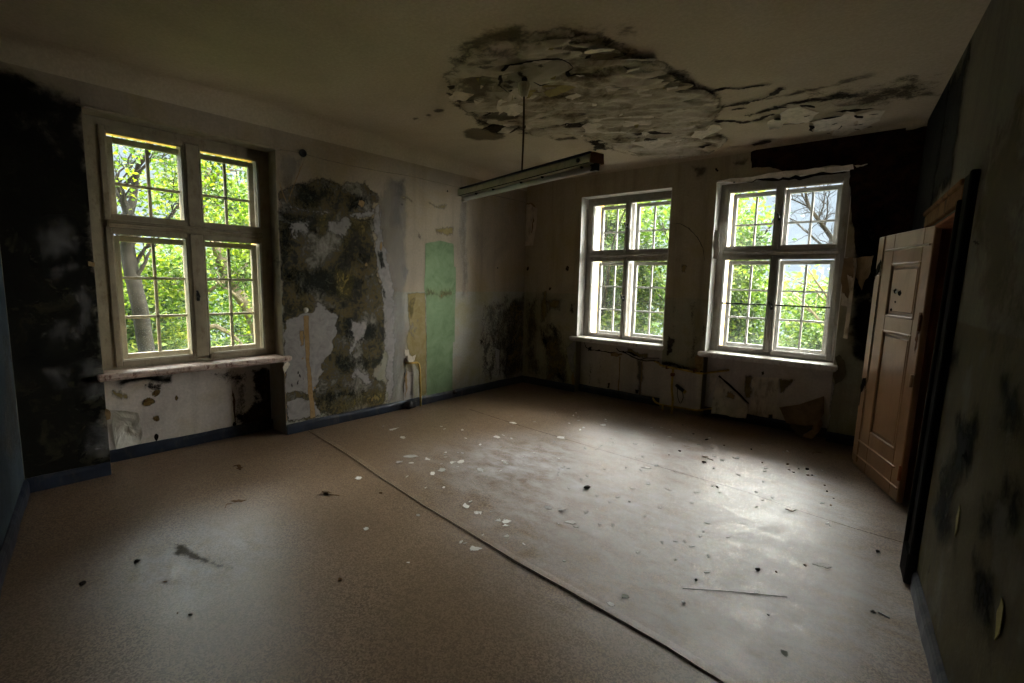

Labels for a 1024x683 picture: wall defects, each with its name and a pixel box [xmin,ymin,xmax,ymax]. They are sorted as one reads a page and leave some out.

water stain [0,69,111,480]
flaking render [283,302,338,422]
water stain [480,291,573,383]
peeling [443,28,927,429]
water stain [668,39,972,230]
water stain [933,412,978,541]